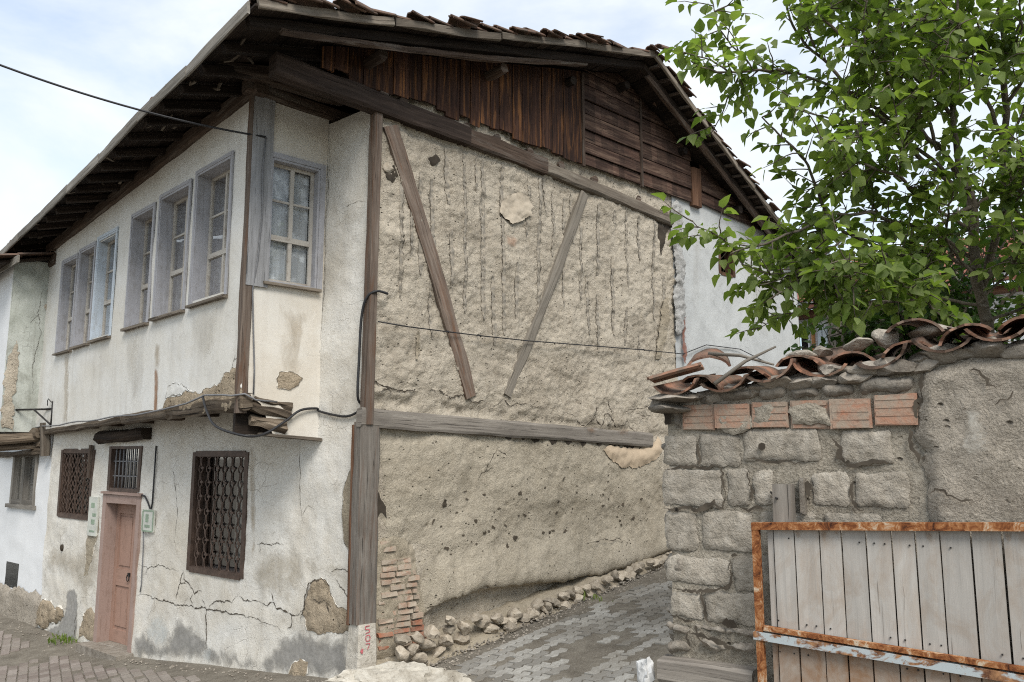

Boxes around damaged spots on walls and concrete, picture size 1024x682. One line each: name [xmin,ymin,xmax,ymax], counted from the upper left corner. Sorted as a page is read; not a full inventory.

flaking render [0,340,20,431]
flaking render [162,367,273,435]
flaking render [276,371,303,390]
crack [143,473,348,648]
flaking render [35,598,64,629]
damp [136,622,231,663]
damp [264,634,345,674]
flaking render [302,577,349,635]
flaking render [376,541,431,651]